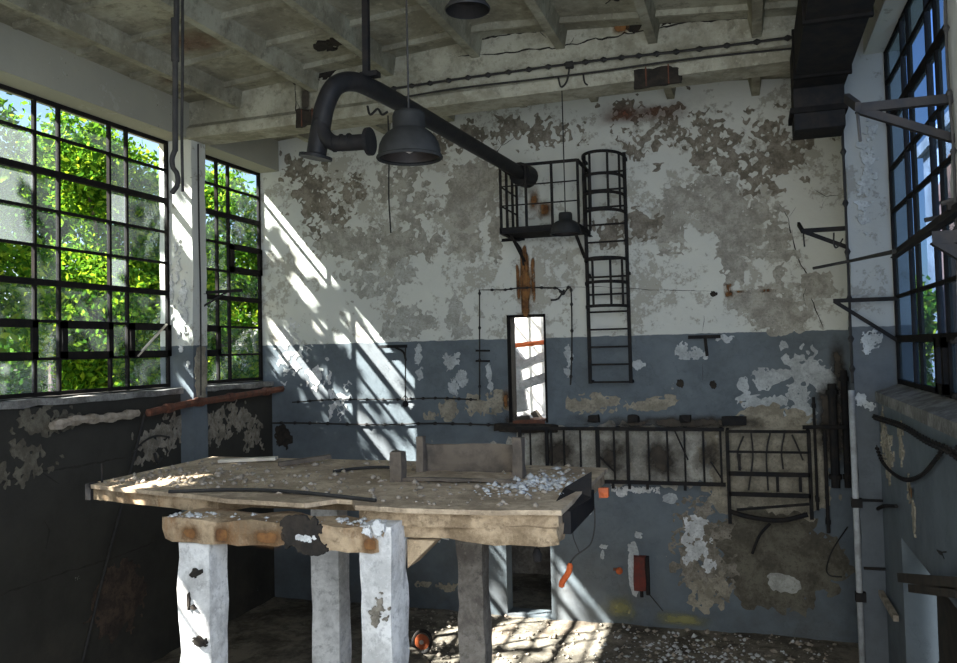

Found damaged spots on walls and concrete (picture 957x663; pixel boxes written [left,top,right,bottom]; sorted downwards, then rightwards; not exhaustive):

spalling [296,108,313,128]
peeling [278,133,503,381]
corrosion [516,245,535,317]
peeling [273,318,352,421]
peeling [423,64,855,618]
peeling [860,329,883,355]
peeling [0,405,82,490]
peeling [131,411,182,467]
peeling [207,400,264,453]
spalling [274,424,293,450]
spalling [280,514,329,556]
peeling [361,519,386,538]